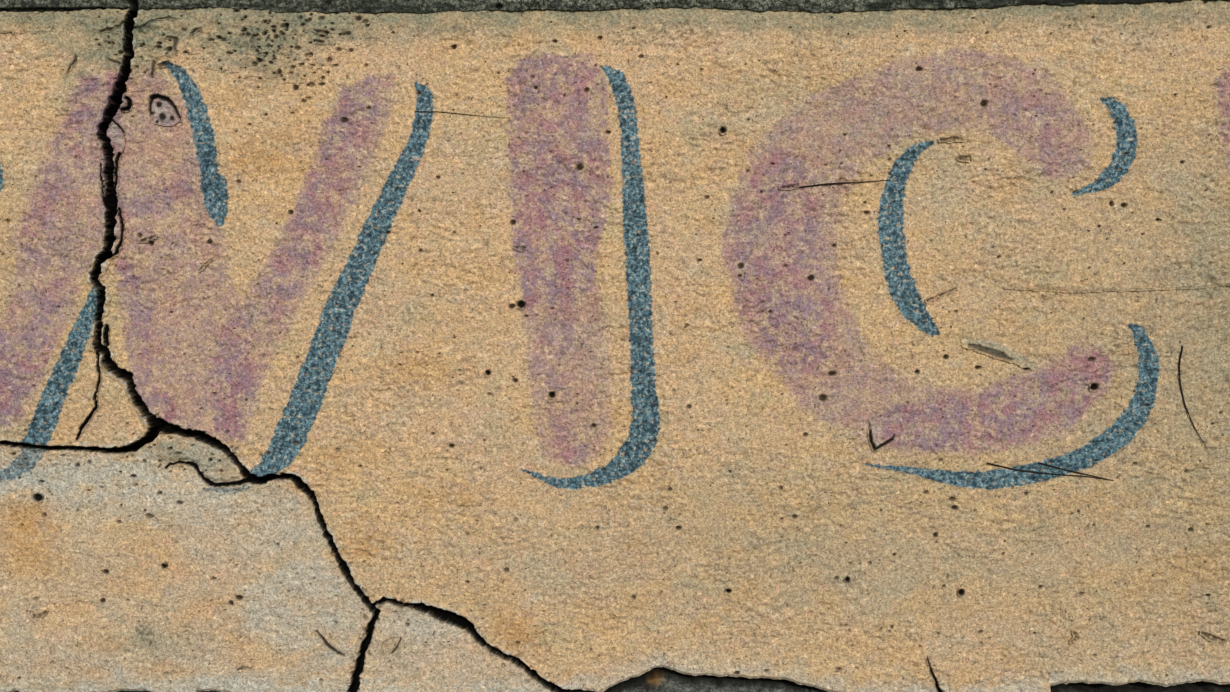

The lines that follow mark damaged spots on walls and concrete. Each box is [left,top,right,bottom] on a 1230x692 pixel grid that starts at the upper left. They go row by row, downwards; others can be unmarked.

crack [0,0,604,692]
spalling [31,492,43,504]
peeling [315,629,346,657]
peeling [378,636,402,658]
spalling [571,667,816,692]
spalling [1050,681,1230,692]